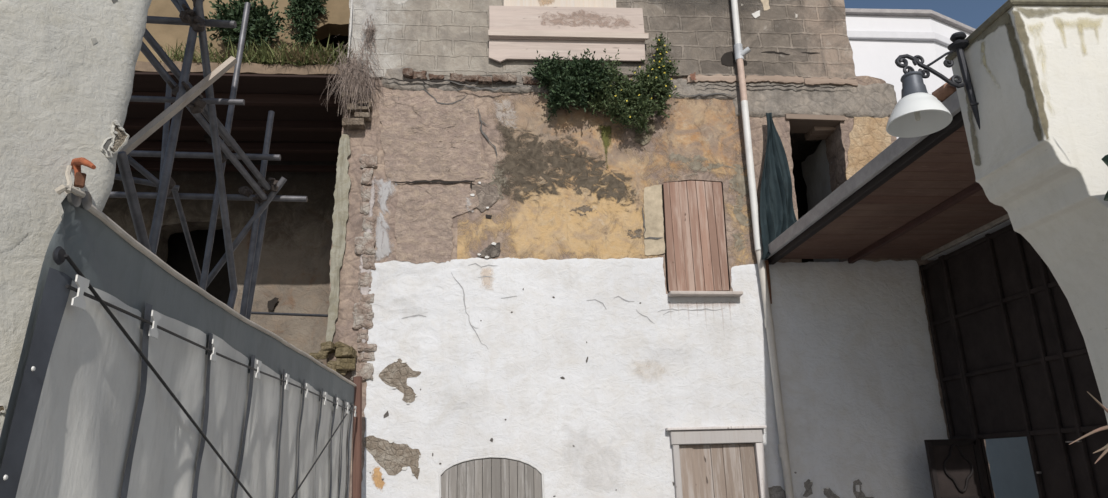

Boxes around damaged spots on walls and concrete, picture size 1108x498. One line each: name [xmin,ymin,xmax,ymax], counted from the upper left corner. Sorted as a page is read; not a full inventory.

leakage [964,6,1108,141]
spalling [340,91,373,130]
spalling [359,154,378,202]
flaking render [466,182,499,219]
leakage [488,122,638,216]
flaking render [478,242,501,258]
flaking render [351,216,421,404]
crack [452,263,515,347]
flaking render [364,436,441,481]
flaking render [768,484,786,498]
flaking render [794,472,877,498]